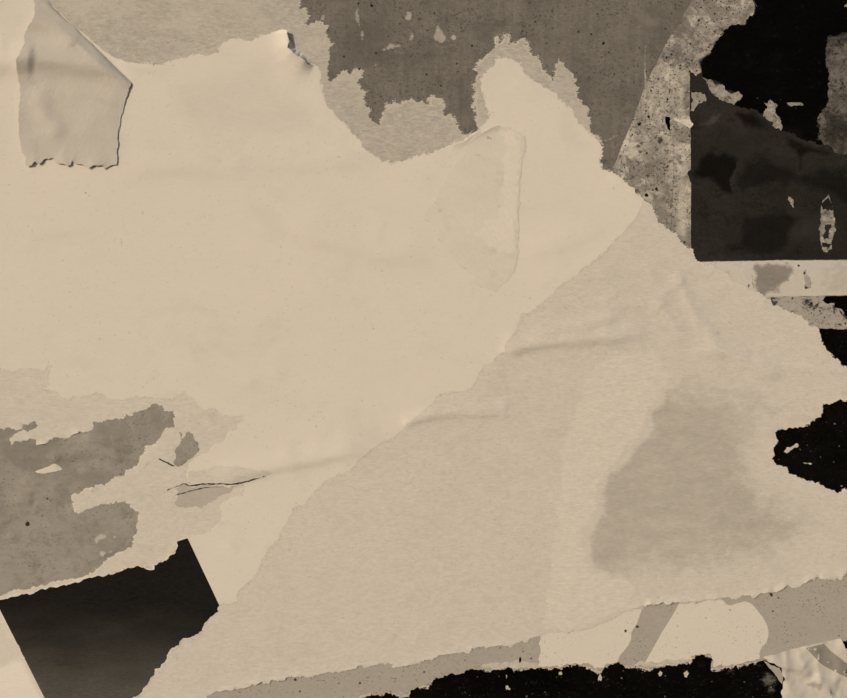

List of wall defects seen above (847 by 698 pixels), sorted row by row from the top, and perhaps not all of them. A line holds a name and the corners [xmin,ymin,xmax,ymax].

peeling [674,78,743,129]
peeling [763,100,803,130]
peeling [817,34,847,154]
peeling [819,194,836,253]
peeling [750,260,811,297]
peeling [822,295,847,316]
peeling [35,464,62,474]
peeling [74,432,270,511]
crack [167,476,265,495]